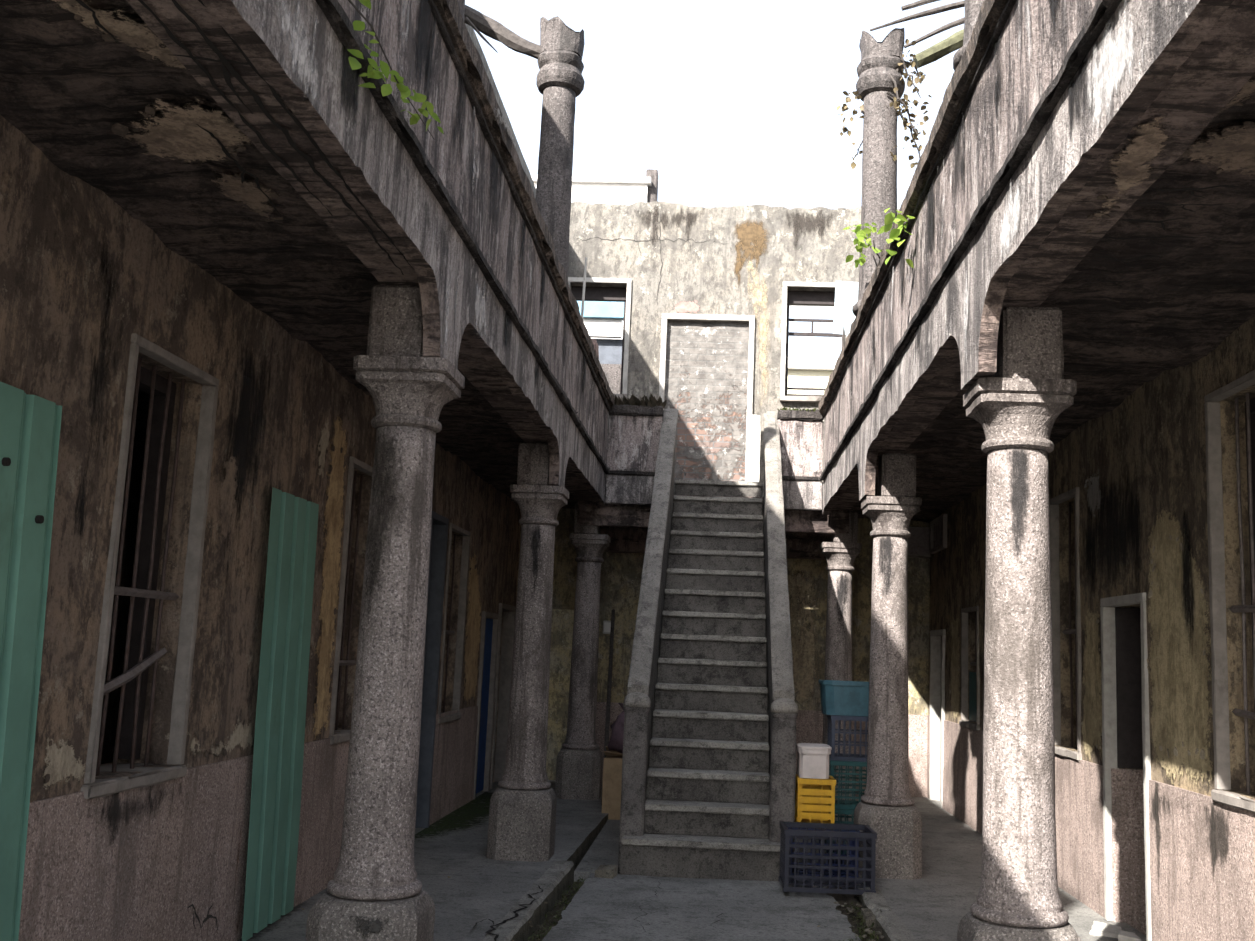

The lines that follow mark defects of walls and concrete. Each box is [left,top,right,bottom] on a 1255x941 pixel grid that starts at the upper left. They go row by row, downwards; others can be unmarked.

spalling [52,0,186,68]
spalling [111,98,283,222]
spalling [1085,117,1171,236]
spalling [1182,75,1255,180]
damp [1182,511,1195,643]
peeling [42,737,86,789]
damp [101,785,181,844]
damp [1206,803,1228,874]
crack [473,884,545,941]